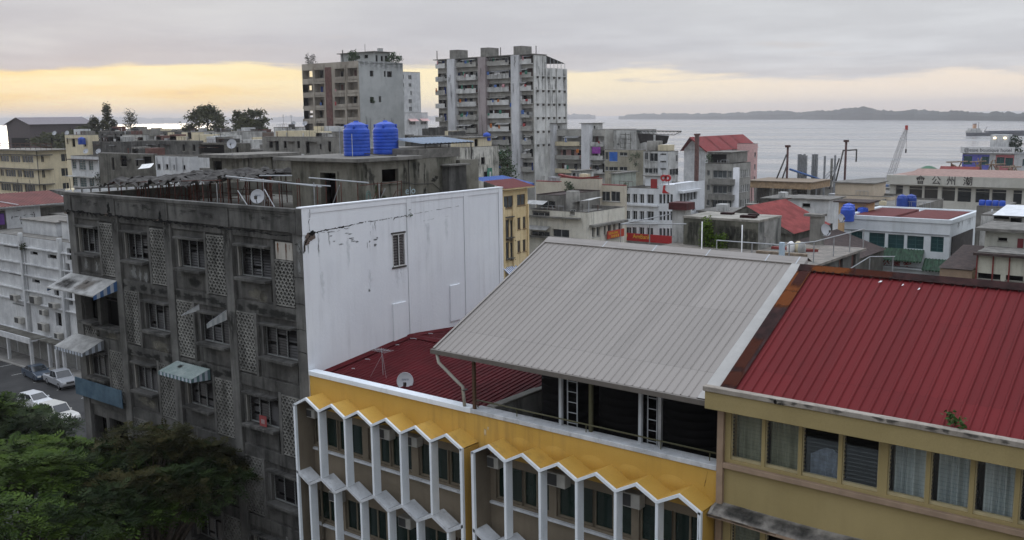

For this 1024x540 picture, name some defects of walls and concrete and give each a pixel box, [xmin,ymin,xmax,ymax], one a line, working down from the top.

crack [66,206,457,238]
rust [722,339,764,386]